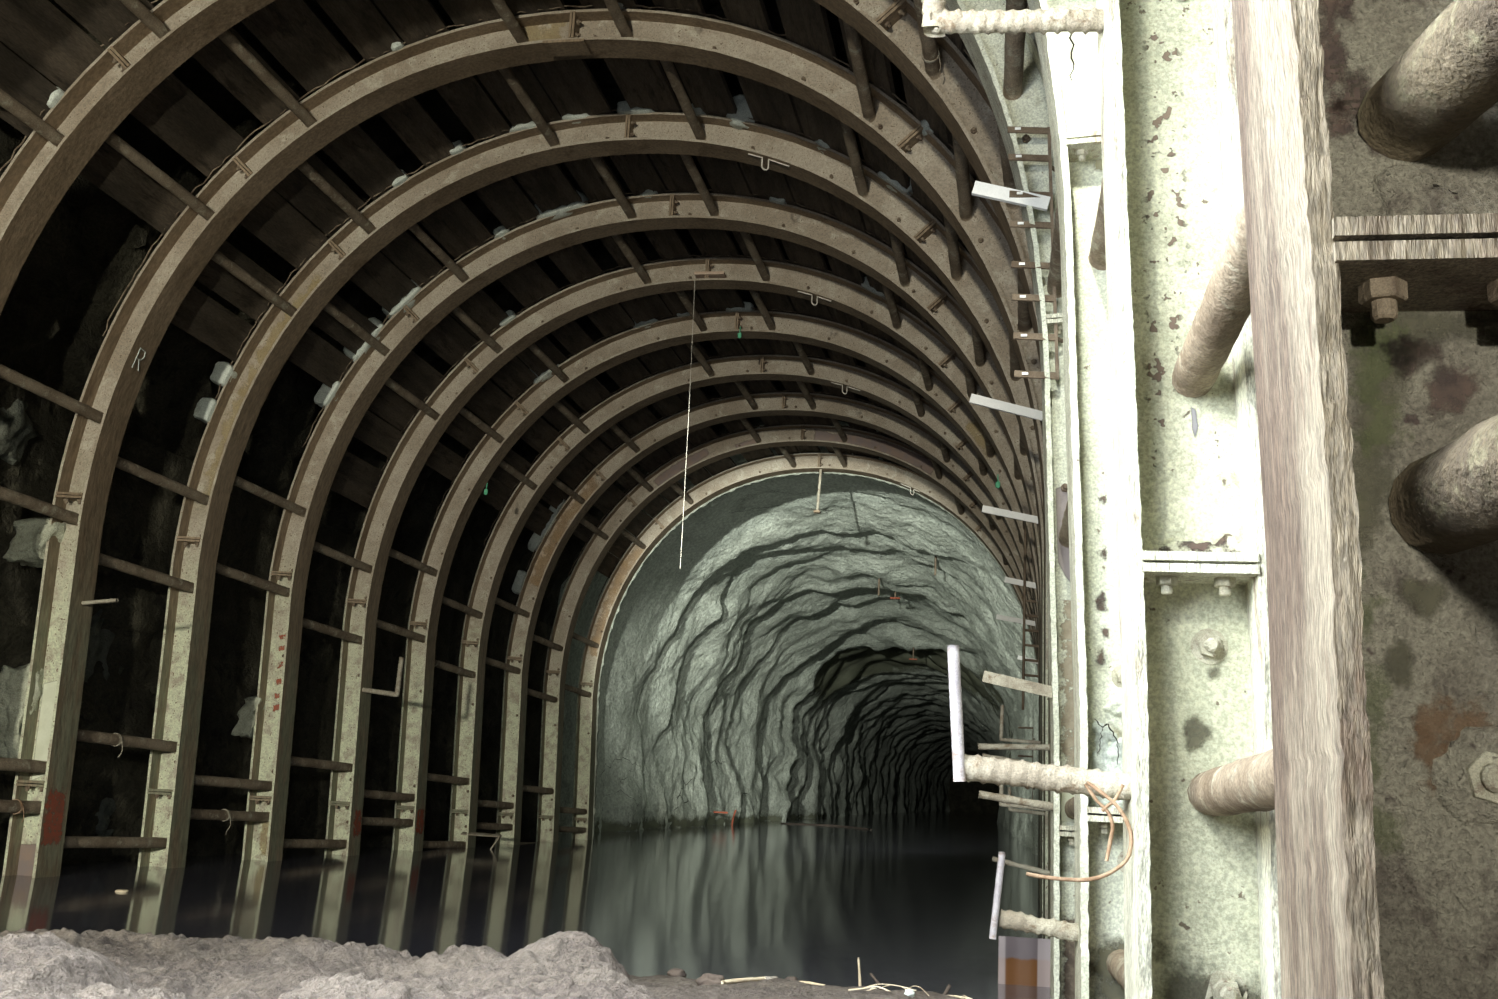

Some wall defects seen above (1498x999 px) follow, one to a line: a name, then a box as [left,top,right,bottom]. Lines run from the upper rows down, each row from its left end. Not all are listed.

corrosion [1320,0,1371,137]
corrosion [1415,697,1492,790]